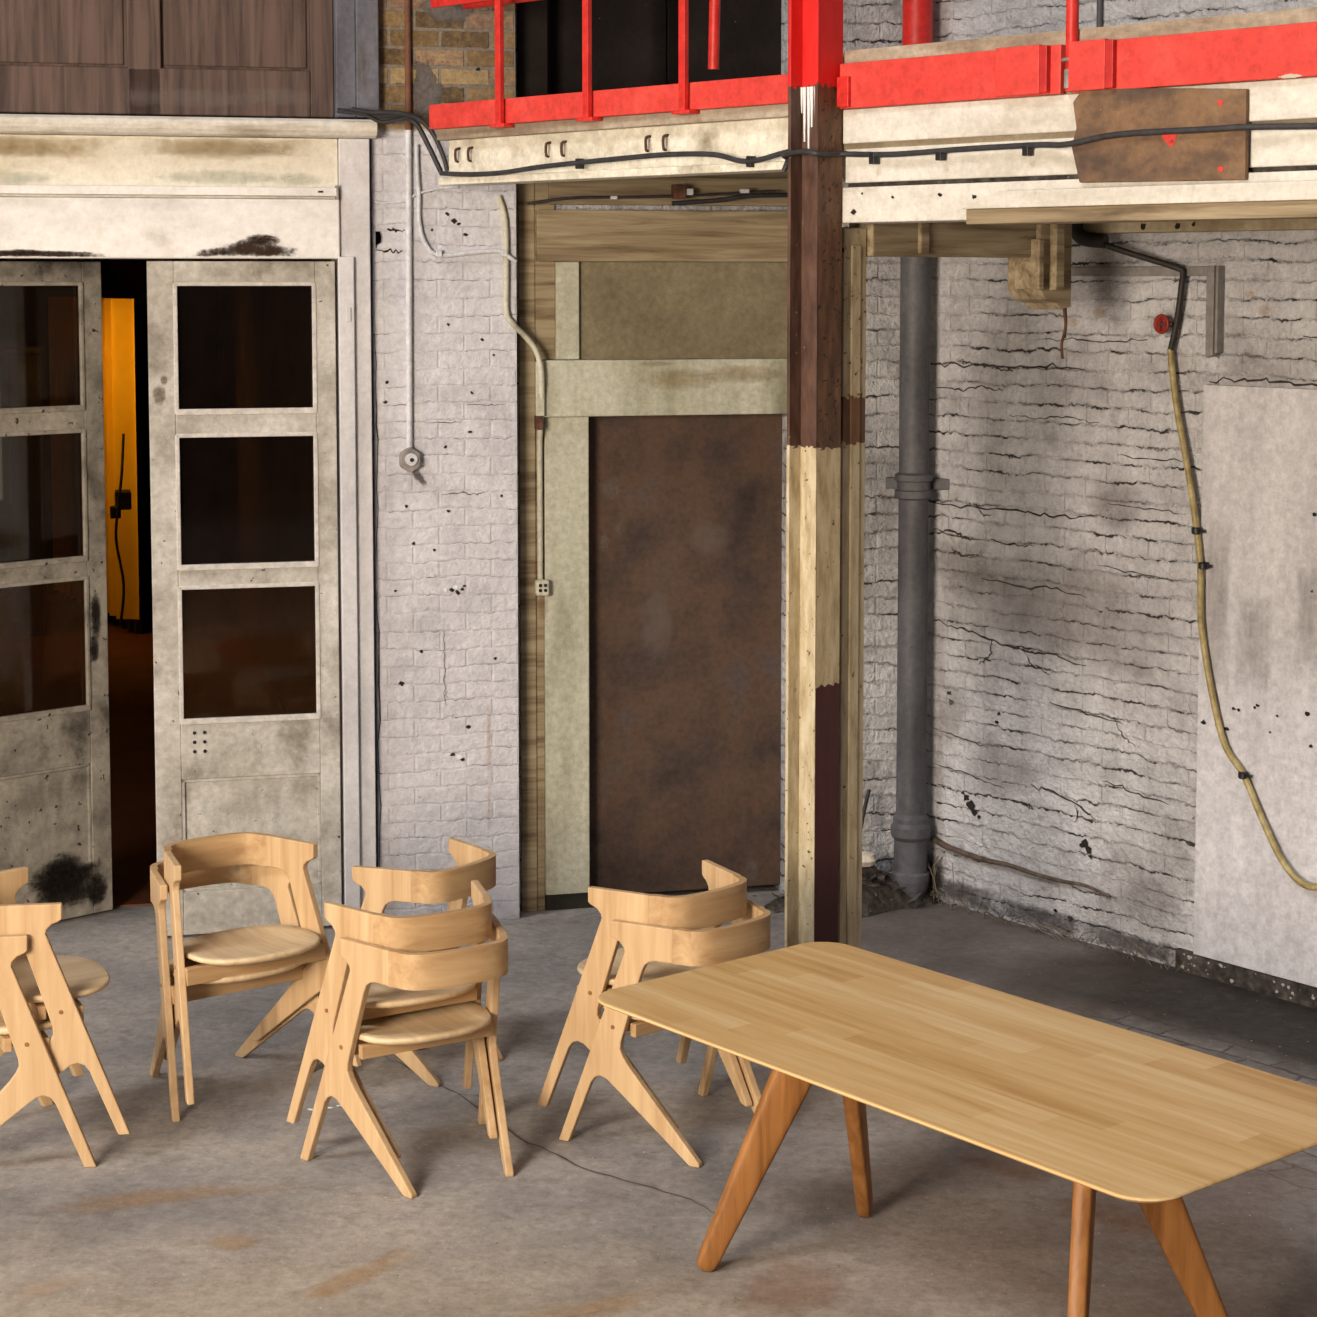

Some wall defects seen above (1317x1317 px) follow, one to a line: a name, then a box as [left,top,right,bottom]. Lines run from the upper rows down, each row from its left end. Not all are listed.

crack [934,337,1148,424]
crack [1209,377,1317,386]
crack [1120,454,1191,462]
crack [931,502,1178,598]
crack [934,619,1135,746]
crack [934,728,1096,820]
crack [1104,781,1169,805]